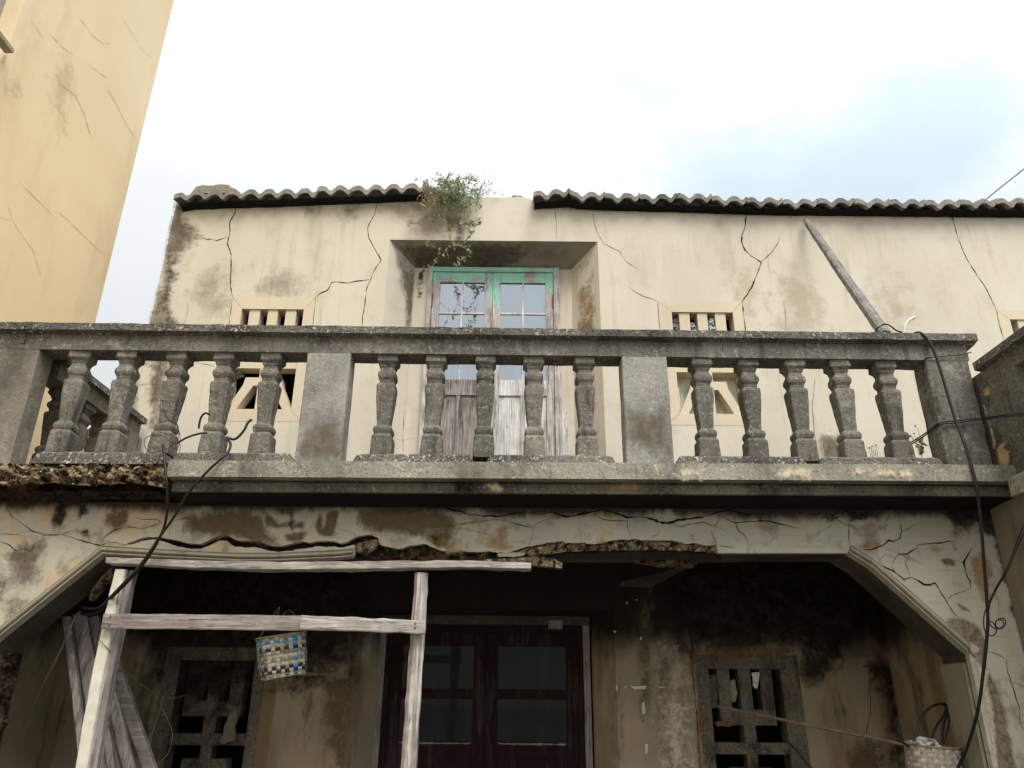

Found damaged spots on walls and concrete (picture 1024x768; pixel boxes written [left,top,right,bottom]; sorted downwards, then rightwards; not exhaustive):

water stain [149,202,197,324]
crack [203,209,236,325]
crack [313,206,381,323]
corrosion [578,275,594,329]
crack [741,207,780,331]
water stain [316,511,338,536]
water stain [359,508,454,548]
crack [444,507,796,548]
water stain [0,539,45,598]
spalling [89,567,116,602]
spalling [354,538,717,604]
crack [820,515,999,615]